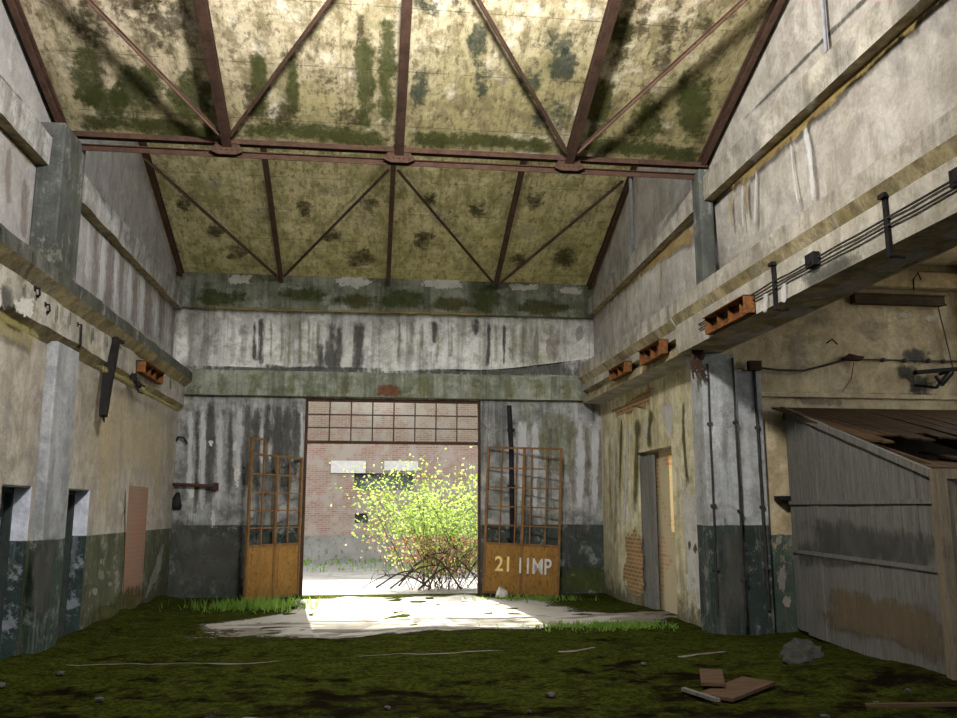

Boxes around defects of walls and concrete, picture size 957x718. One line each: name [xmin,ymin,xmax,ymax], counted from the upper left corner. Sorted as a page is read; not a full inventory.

water stain [243,16,397,146]
water stain [410,67,428,106]
water stain [466,23,490,97]
water stain [520,3,712,162]
water stain [412,131,551,152]
water stain [252,319,264,363]
water stain [318,324,365,369]
water stain [472,319,491,366]
water stain [186,405,303,509]
water stain [517,422,539,510]
water stain [575,404,688,524]
peeling [180,479,701,639]